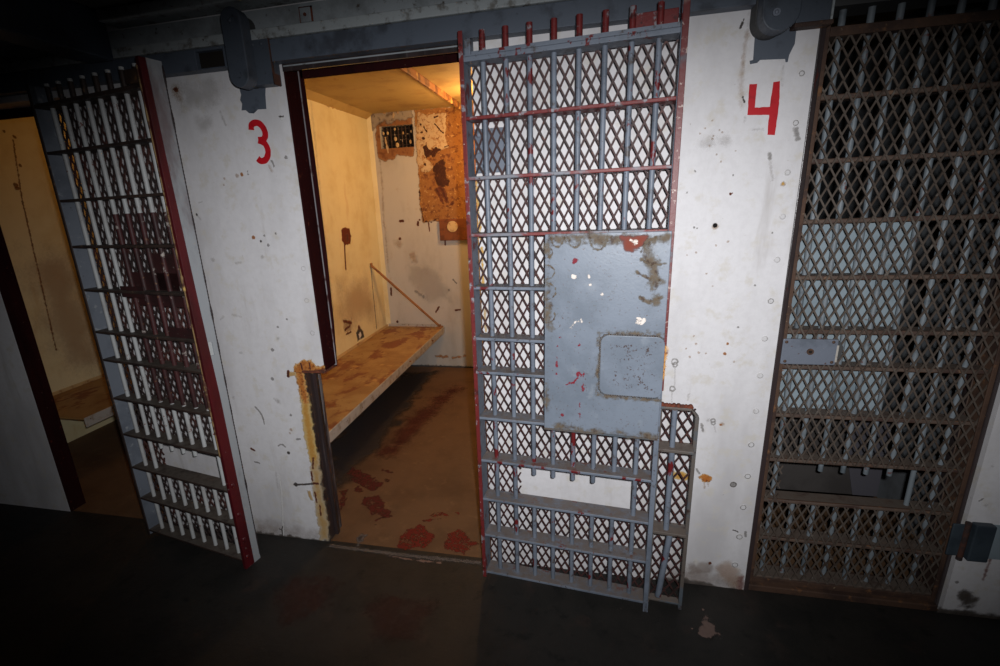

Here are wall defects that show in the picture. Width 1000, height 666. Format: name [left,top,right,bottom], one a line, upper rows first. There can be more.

flaking render [371,105,478,223]
corrosion [341,227,351,270]
corrosion [287,359,329,541]
corrosion [673,468,712,482]